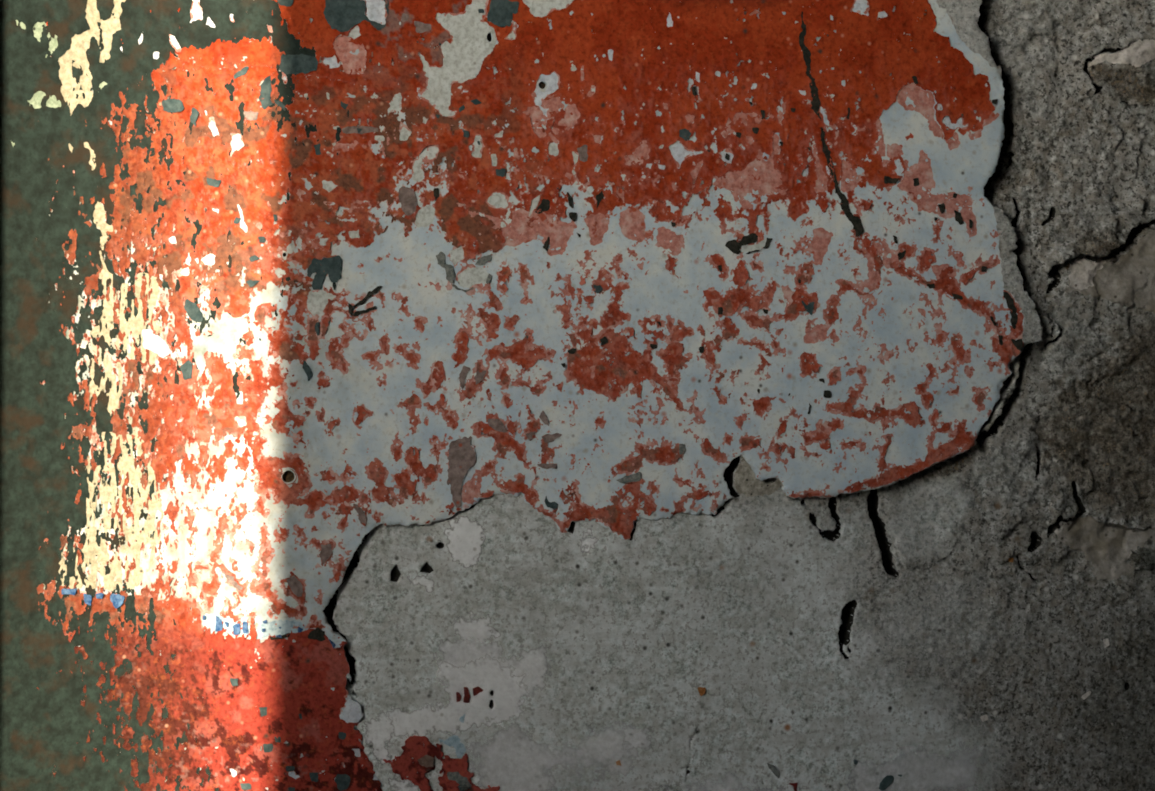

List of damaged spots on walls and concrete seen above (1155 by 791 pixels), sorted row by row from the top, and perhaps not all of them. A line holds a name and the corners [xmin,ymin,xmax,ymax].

peeling [16,0,126,116]
peeling [190,0,215,28]
peeling [323,0,573,124]
crack [977,0,1155,293]
peeling [37,93,1024,648]
crack [976,326,1062,446]
crack [1034,445,1042,476]
crack [801,497,841,541]
crack [867,489,899,578]
crack [1047,481,1086,537]
spalling [838,600,857,659]
peeling [383,735,500,791]